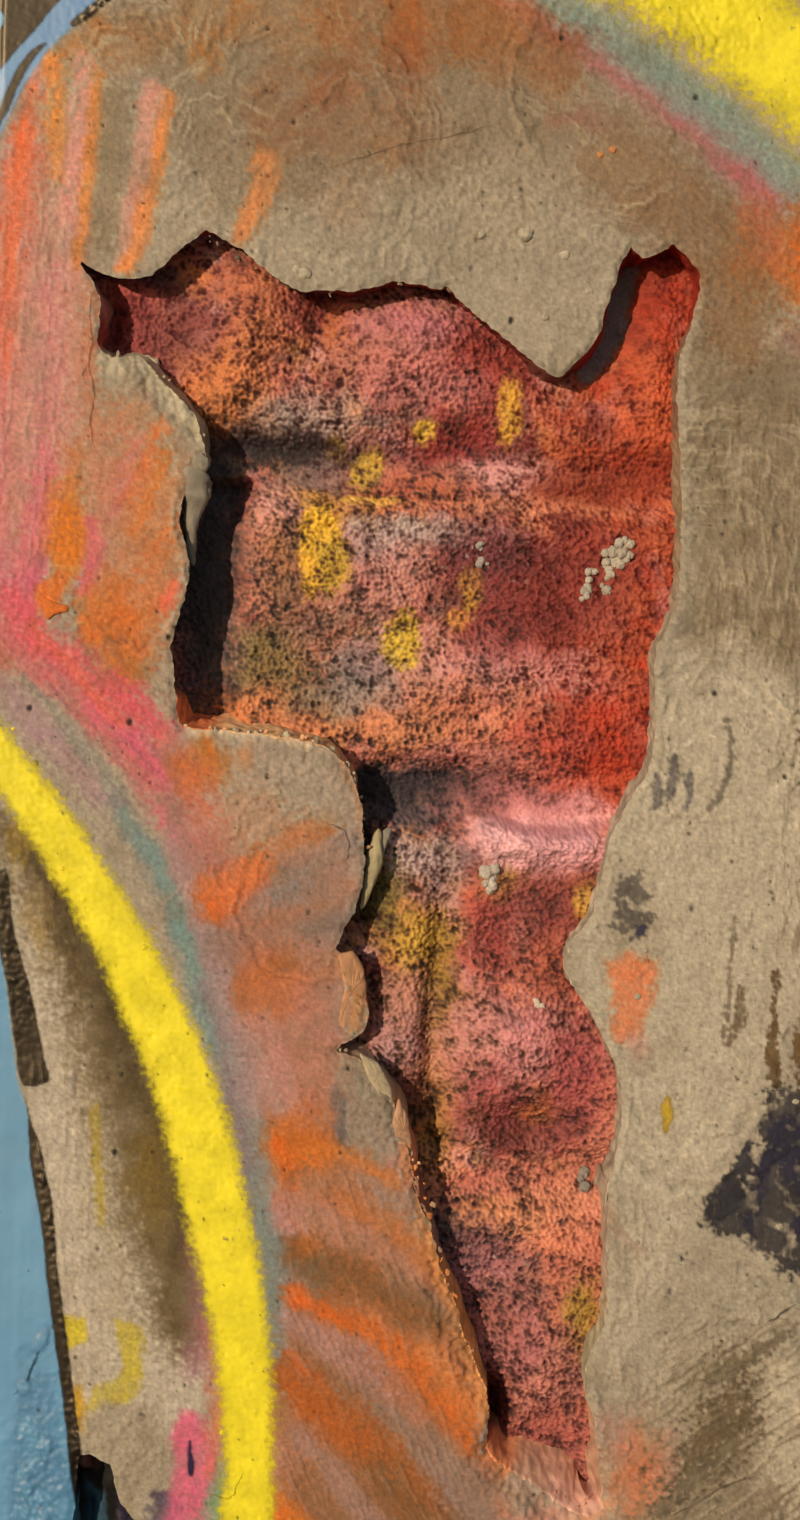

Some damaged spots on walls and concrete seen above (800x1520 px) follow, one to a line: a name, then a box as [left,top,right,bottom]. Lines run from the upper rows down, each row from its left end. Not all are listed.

peeling [708,718,734,810]
spalling [81,230,701,1518]
spalling [73,1454,134,1520]